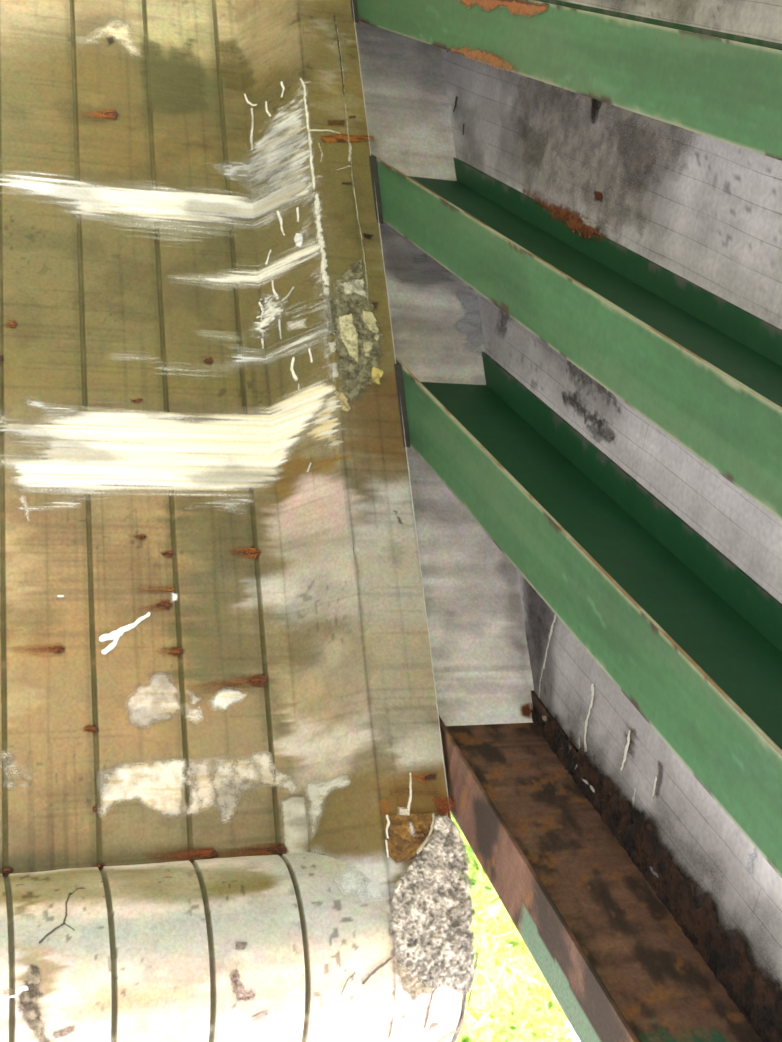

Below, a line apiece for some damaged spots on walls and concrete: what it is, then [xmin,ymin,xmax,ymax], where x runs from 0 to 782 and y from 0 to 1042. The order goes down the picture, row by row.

corrosion [448,46,518,72]
damp [511,80,692,233]
corrosion [523,190,604,240]
damp [0,39,344,518]
spalling [324,259,384,412]
mould [562,360,620,441]
damp [529,586,551,659]
peeling [127,674,247,727]
peeling [98,753,350,854]
corrosion [161,845,288,862]
crack [39,888,85,943]
spalling [385,812,476,1000]